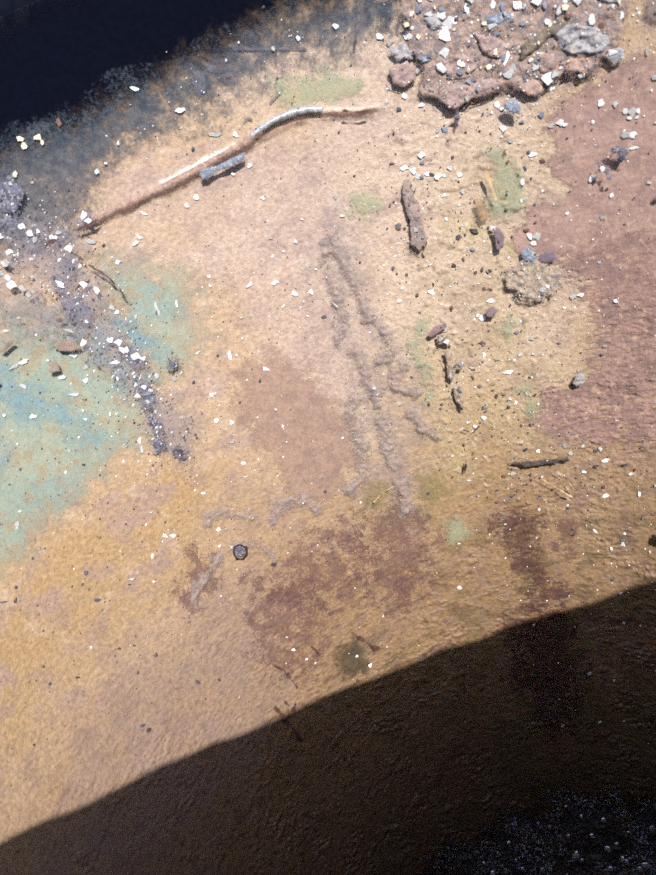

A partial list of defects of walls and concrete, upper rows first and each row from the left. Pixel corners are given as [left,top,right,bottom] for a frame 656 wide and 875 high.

corrosion [386,0,656,456]
corrosion [487,448,591,736]